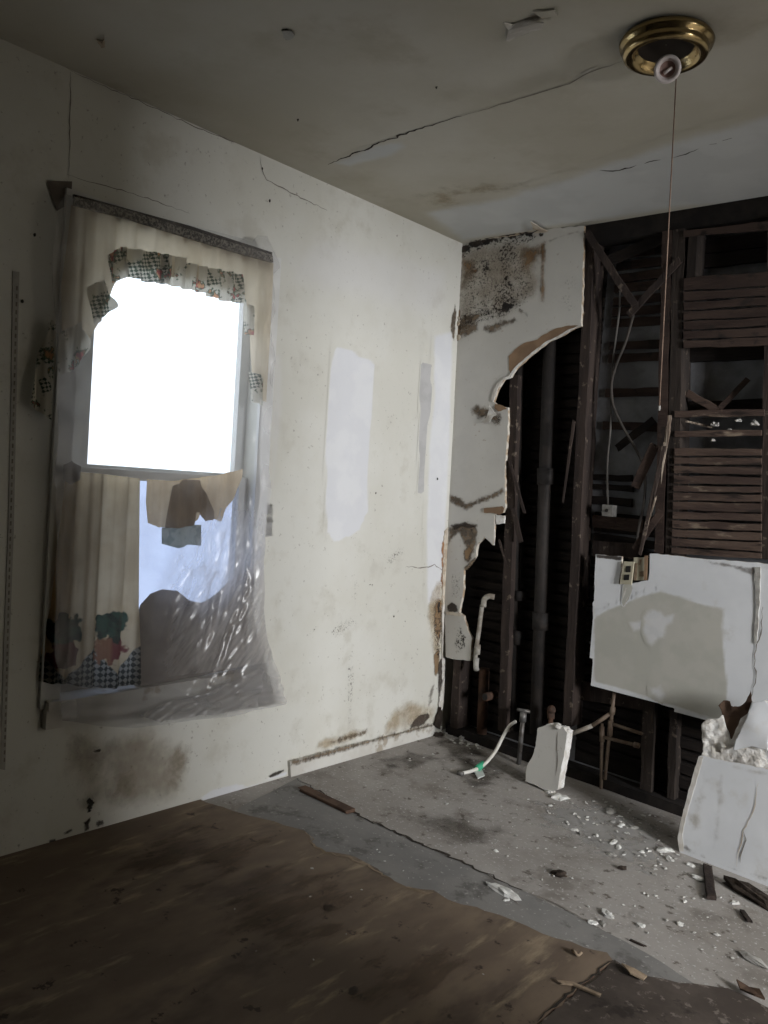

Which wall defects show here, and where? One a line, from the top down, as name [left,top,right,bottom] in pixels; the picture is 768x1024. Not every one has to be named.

crack [66,67,236,213]
crack [260,161,326,210]
crack [330,61,622,164]
peeling [451,308,461,341]
mould [458,230,546,336]
damp [430,600,442,675]
peeling [433,528,462,729]
damp [390,707,429,728]